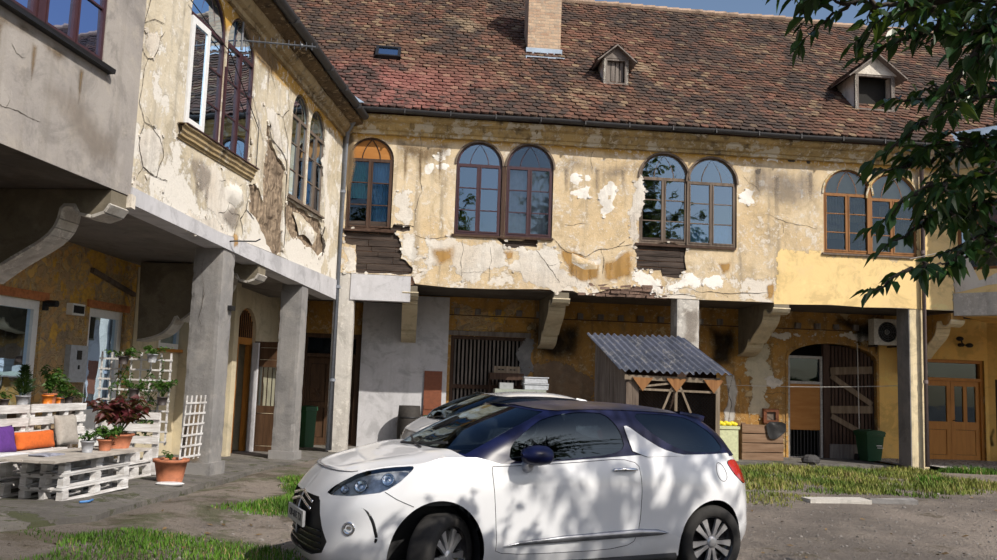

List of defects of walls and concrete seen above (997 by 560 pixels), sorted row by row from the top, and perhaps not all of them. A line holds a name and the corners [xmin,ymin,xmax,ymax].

crack [137,0,167,181]
peeling [186,162,235,235]
flaking render [248,101,334,260]
peeling [424,149,451,174]
peeling [738,182,765,206]
peeling [343,173,723,299]
leakage [712,330,733,364]
leakage [724,375,738,422]
peeling [745,332,816,420]